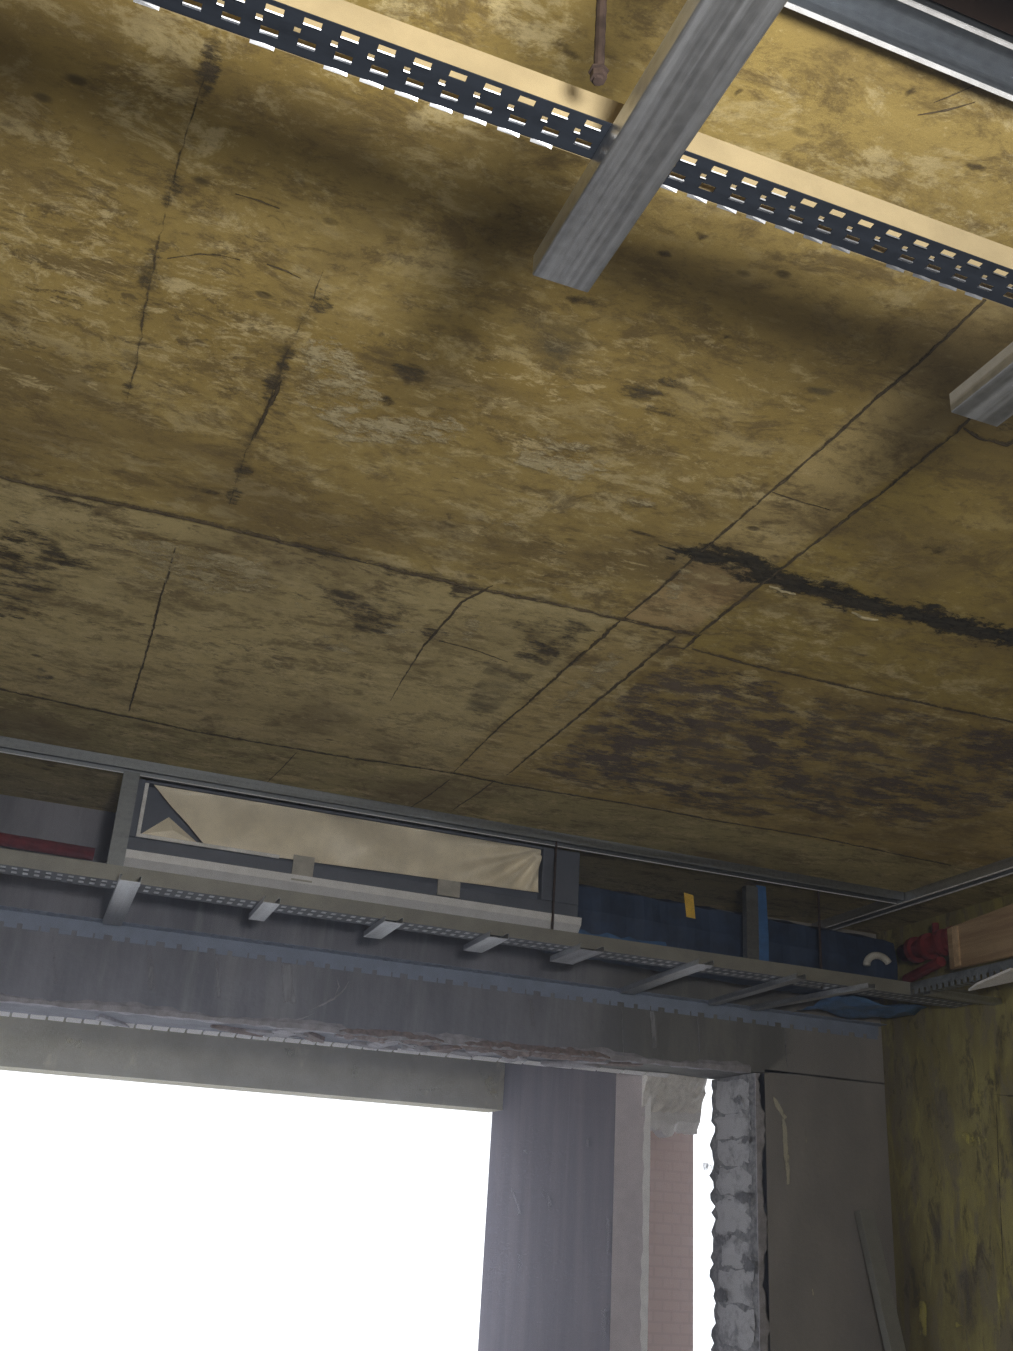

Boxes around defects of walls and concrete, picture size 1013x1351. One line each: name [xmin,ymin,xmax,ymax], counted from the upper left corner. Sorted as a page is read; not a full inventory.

crack [164,44,220,205]
crack [125,241,332,394]
damp [0,521,87,619]
crack [0,299,1013,866]
damp [537,662,1013,831]